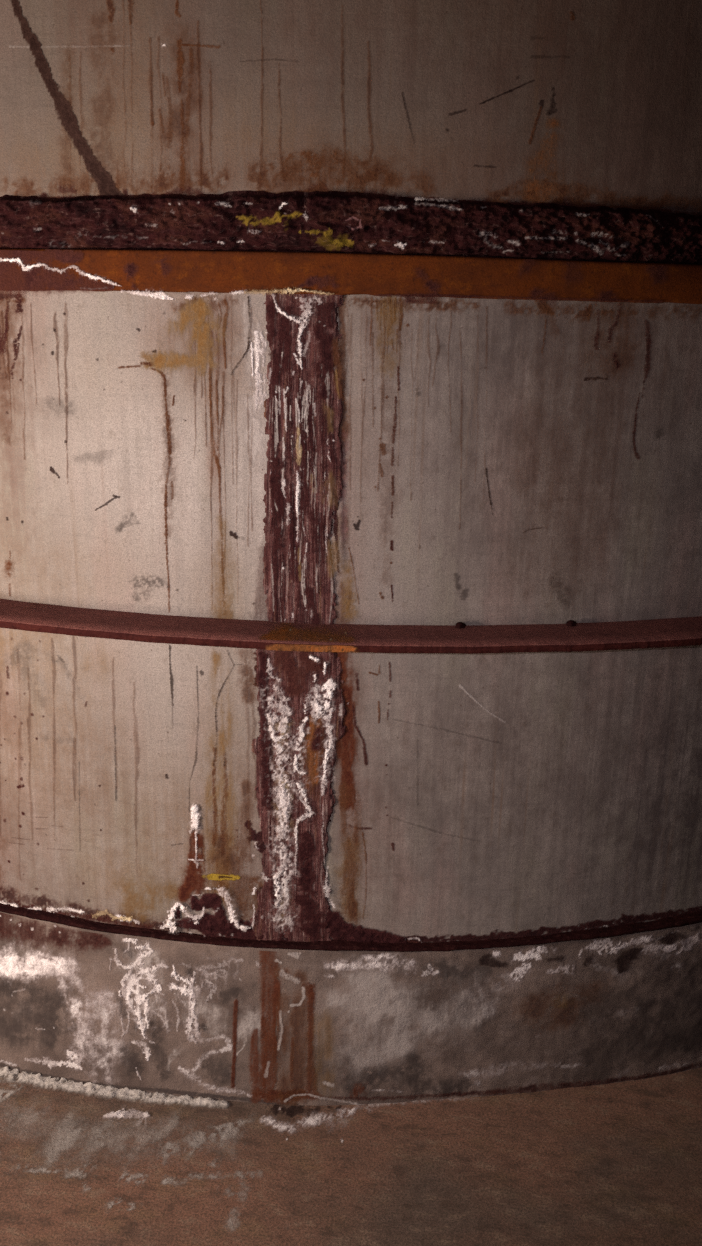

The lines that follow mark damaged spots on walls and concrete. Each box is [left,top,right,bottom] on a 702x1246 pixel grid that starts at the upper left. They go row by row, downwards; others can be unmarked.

corrosion [250,151,702,215]
corrosion [0,249,114,381]
corrosion [0,270,702,1103]
damp [188,804,201,867]
damp [205,656,336,932]
damp [0,886,698,1140]
damp [190,1121,242,1147]